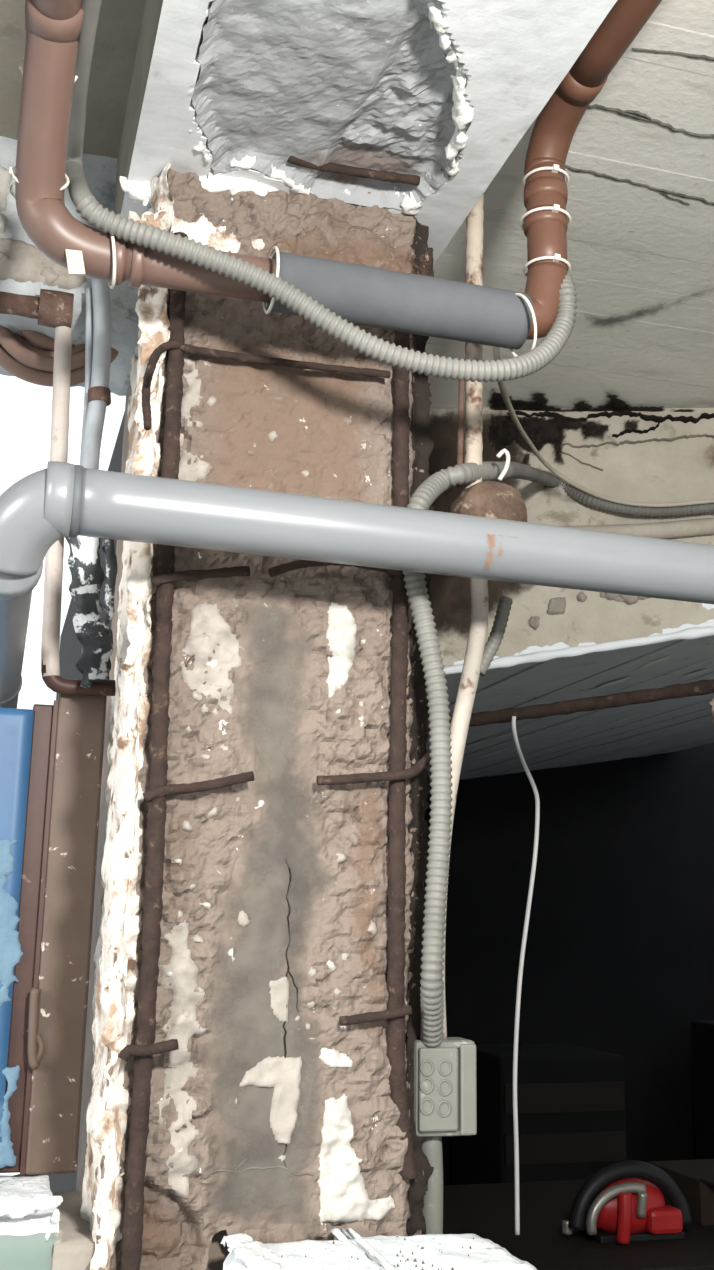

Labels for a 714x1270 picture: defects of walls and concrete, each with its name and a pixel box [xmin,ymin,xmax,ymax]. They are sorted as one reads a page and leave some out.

crack [632,48,714,61]
spalling [120,0,474,277]
crack [588,104,714,138]
crack [565,165,714,205]
peeling [0,165,87,290]
spalling [125,285,434,507]
crack [507,410,714,471]
flaking render [528,591,650,630]
flaking render [443,664,463,675]
flaking render [487,626,714,671]
peeling [0,839,23,1007]
spalling [80,541,434,1270]